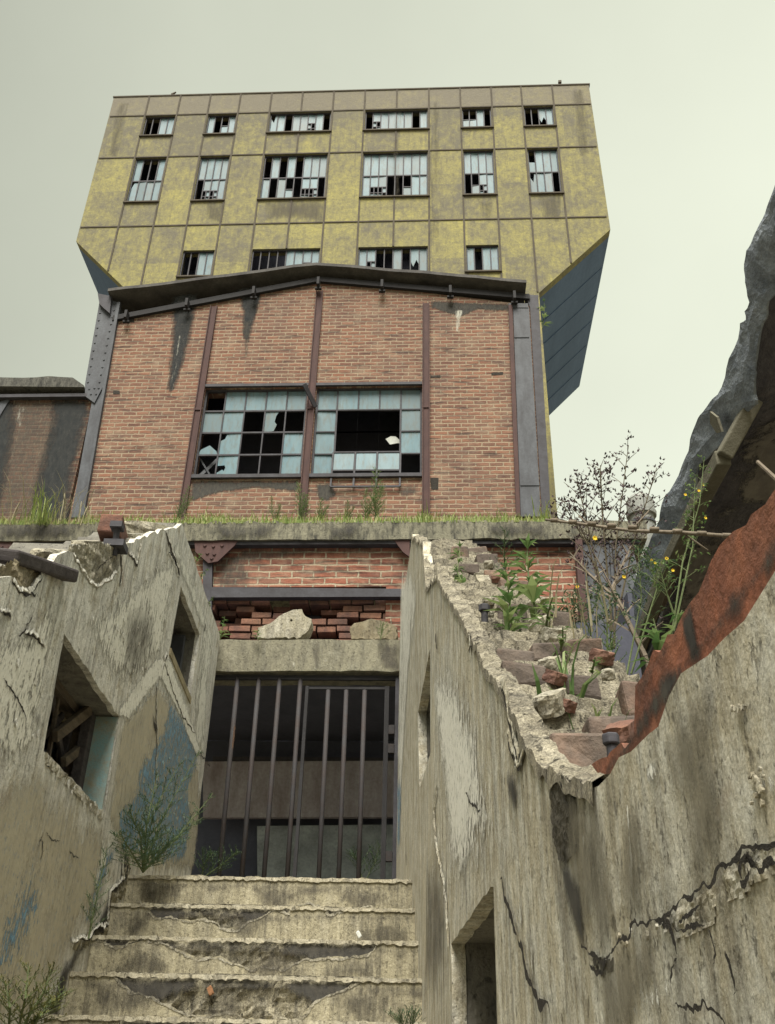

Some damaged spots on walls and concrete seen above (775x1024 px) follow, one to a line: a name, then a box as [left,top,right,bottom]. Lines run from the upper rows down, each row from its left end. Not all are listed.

damp [169,294,196,391]
damp [240,287,260,340]
peeling [0,542,381,1024]
crack [500,876,552,1022]
crack [581,841,775,1024]